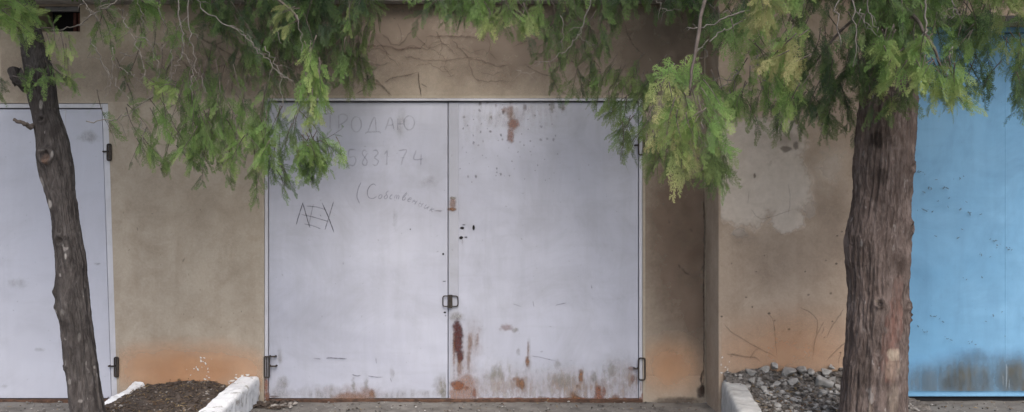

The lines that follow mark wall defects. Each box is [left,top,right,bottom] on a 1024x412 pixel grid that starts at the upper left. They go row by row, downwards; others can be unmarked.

rust [508,119,519,142]
damp [127,352,255,386]
rust [449,321,626,399]